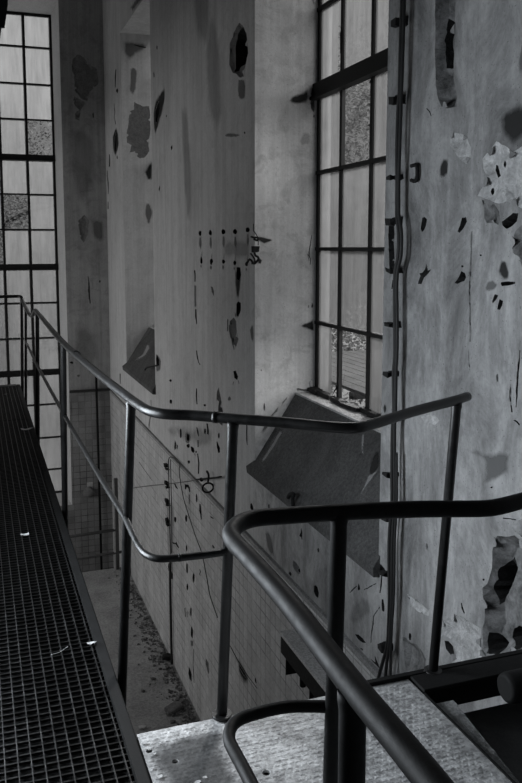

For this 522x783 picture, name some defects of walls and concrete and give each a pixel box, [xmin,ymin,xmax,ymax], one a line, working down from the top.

peeling [72,53,98,120]
peeling [113,90,167,159]
spalling [229,23,248,99]
spalling [435,0,457,108]
flaking render [450,133,471,164]
peeling [78,215,102,242]
flaking render [478,141,522,265]
flaking render [441,535,522,663]